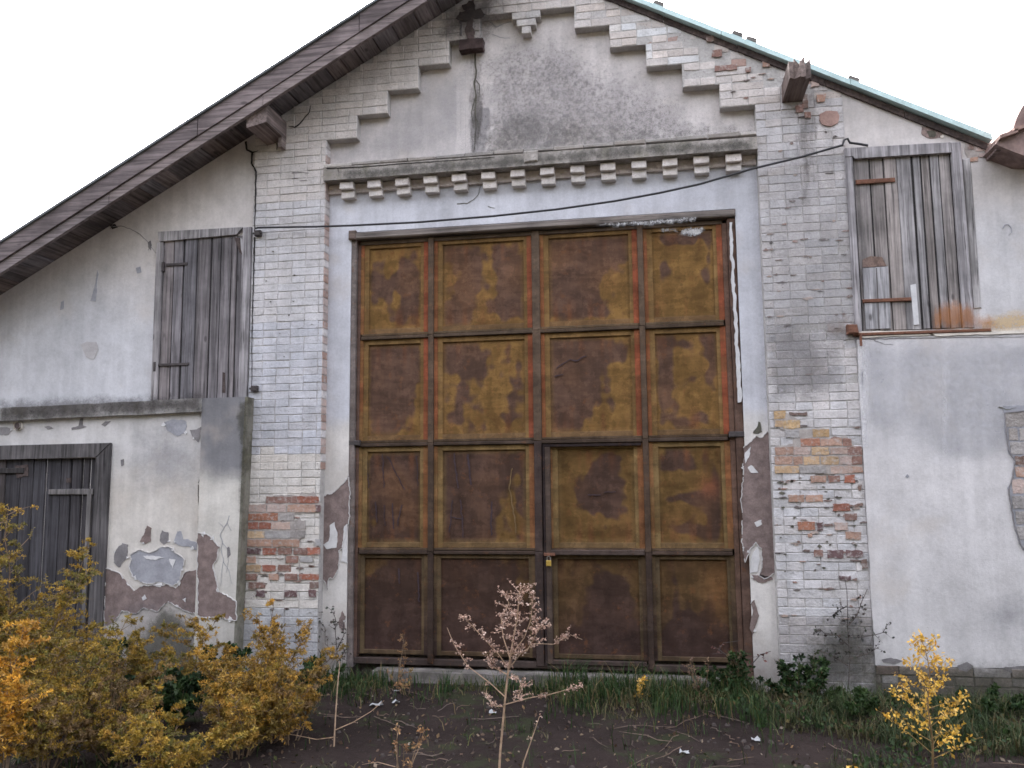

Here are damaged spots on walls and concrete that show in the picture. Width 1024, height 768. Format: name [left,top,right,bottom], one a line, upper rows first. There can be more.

flaking render [706,35,775,81]
crack [292,54,490,181]
flaking render [795,81,839,138]
peeling [103,525,245,629]
peeling [162,419,201,442]
flaking render [246,475,351,611]
peeling [750,600,759,636]
peeling [740,411,868,591]
flaking render [1006,412,1024,509]